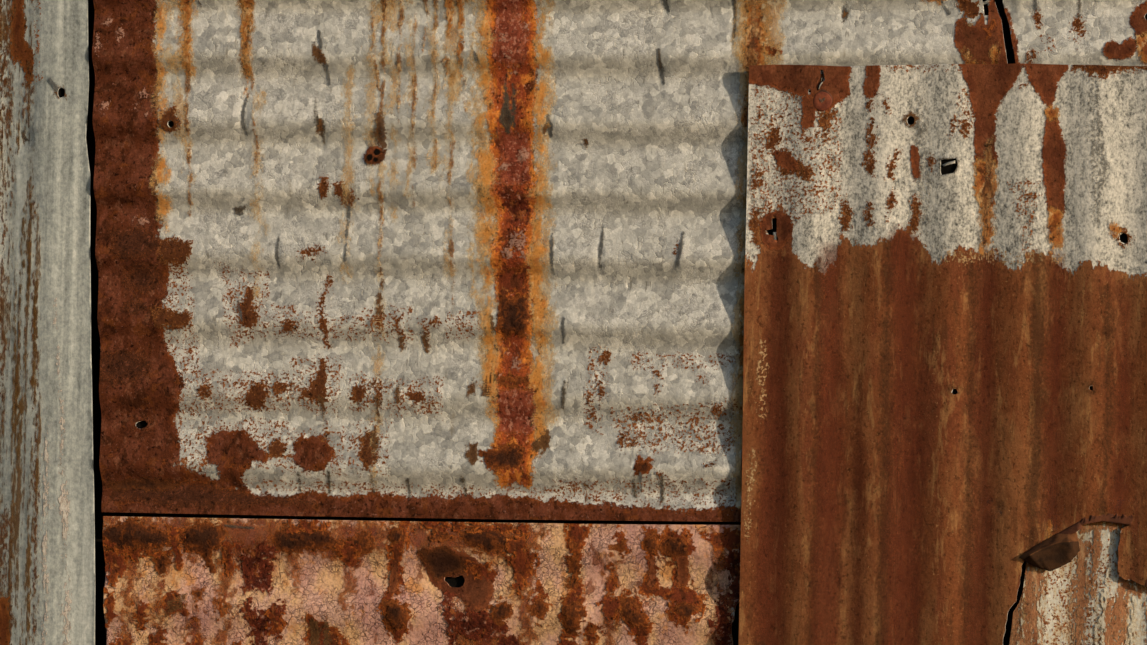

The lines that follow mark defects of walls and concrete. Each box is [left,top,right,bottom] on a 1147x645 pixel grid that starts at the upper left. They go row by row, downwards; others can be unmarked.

rust [237,0,260,161]
rust [364,0,405,166]
rust [862,64,949,178]
rust [1071,1,1147,81]
rust [317,173,360,261]
rust [884,145,936,223]
rust [0,0,43,645]
rust [214,262,414,352]
rust [386,375,444,417]
rust [583,347,615,435]
rust [633,455,655,492]
rust [102,516,553,645]